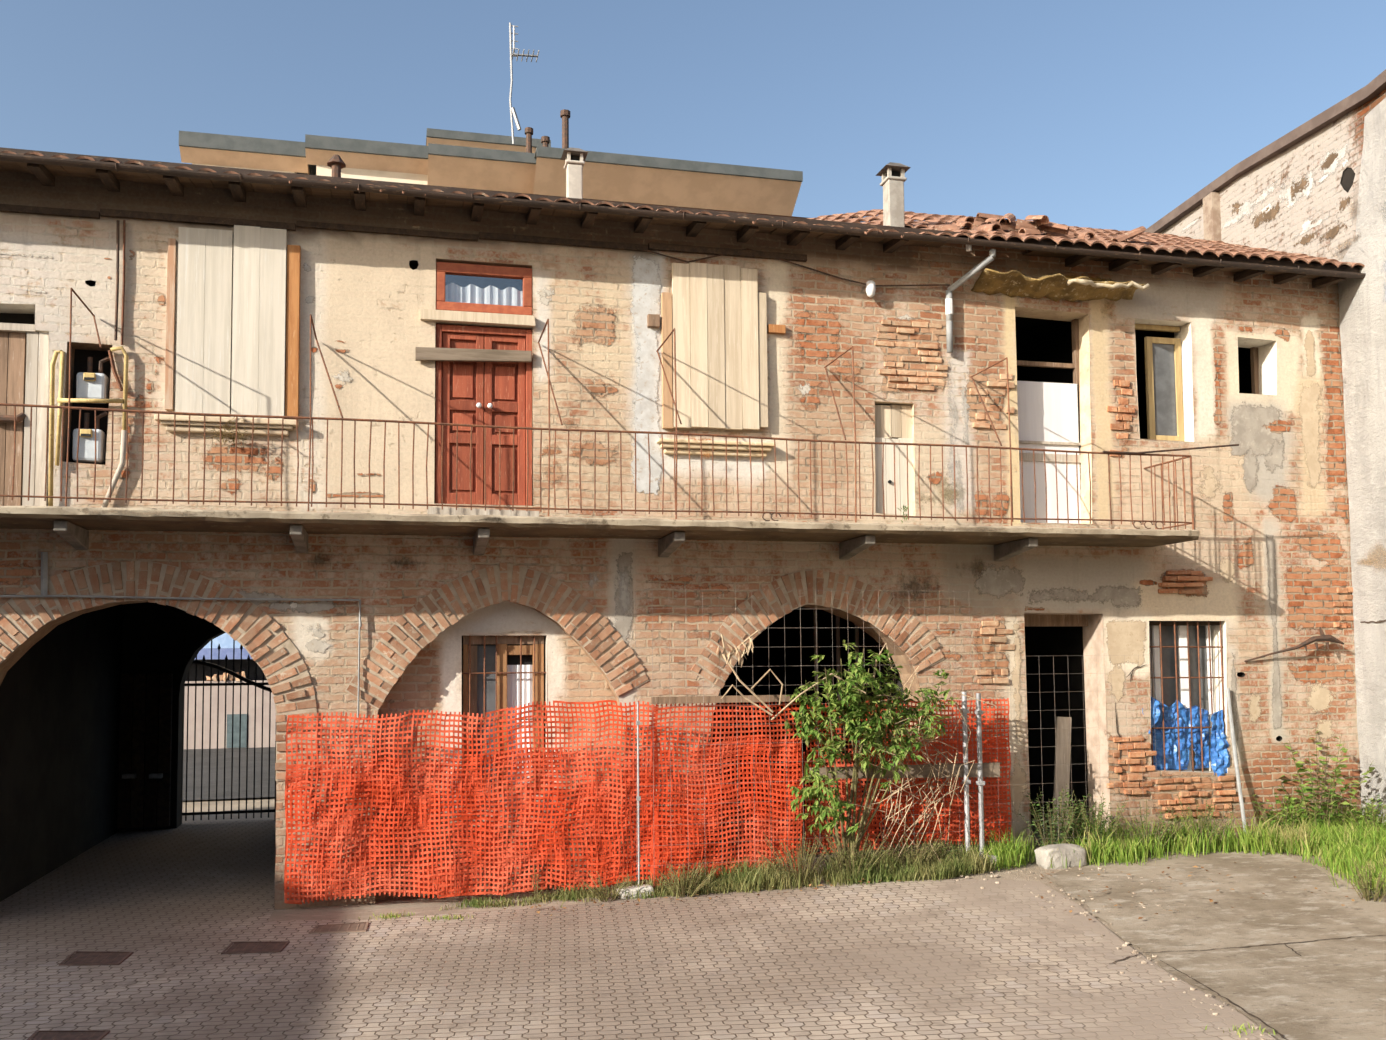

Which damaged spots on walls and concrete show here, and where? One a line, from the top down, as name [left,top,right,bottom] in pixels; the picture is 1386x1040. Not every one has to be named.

flaking render [1223,144,1351,229]
flaking render [1293,197,1350,247]
flaking render [541,255,663,496]
spalling [794,307,948,409]
spalling [965,372,1015,430]
flaking render [1197,328,1354,630]
flaking render [935,536,1254,821]
flaking render [1288,663,1356,742]